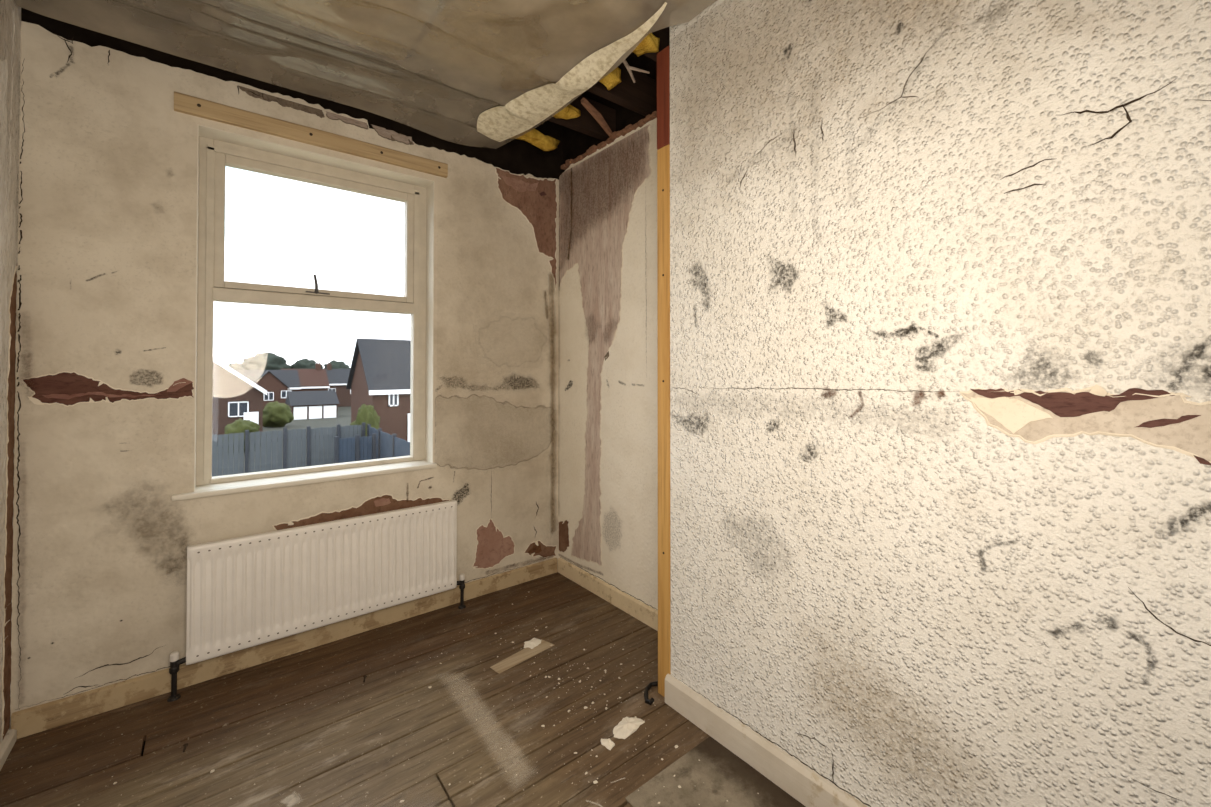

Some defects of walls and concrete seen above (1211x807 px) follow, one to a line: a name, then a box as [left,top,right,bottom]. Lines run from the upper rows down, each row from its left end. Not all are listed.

crack [1063,80,1174,146]
crack [1000,159,1051,193]
peeling [472,124,652,569]
peeling [959,384,1211,465]
peeling [2,266,194,739]
peeling [272,494,453,531]